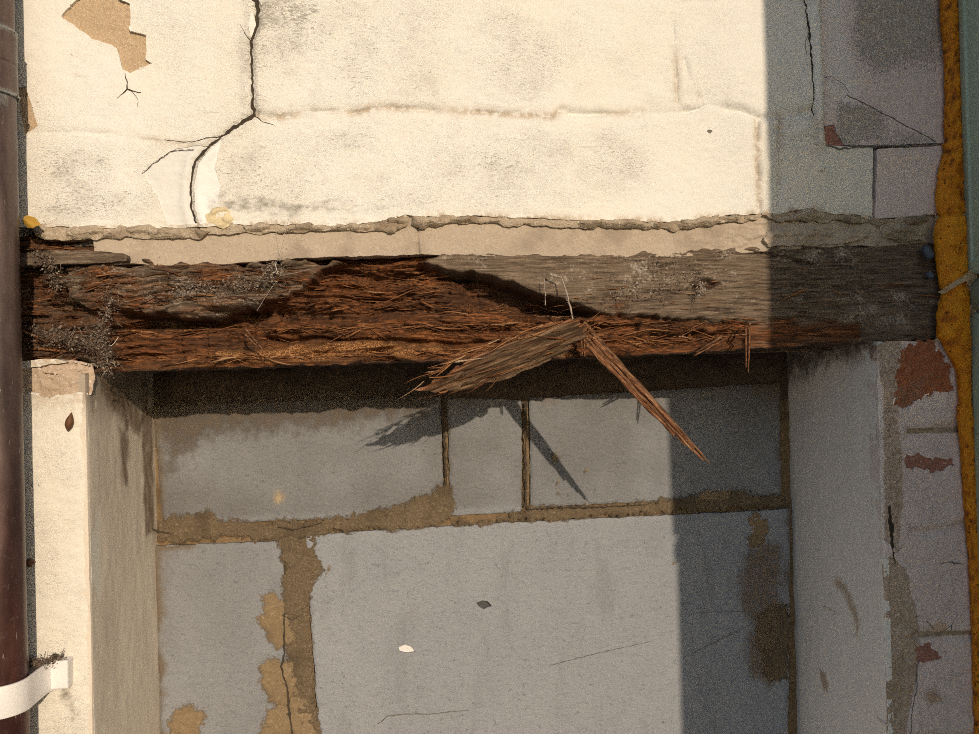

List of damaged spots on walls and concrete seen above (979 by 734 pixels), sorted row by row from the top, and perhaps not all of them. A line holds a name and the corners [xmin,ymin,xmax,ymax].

peeling [63,0,151,73]
crack [142,0,273,223]
crack [804,0,937,150]
spalling [892,339,953,410]
spalling [904,453,954,473]
crack [888,506,903,564]
peeling [882,556,941,734]